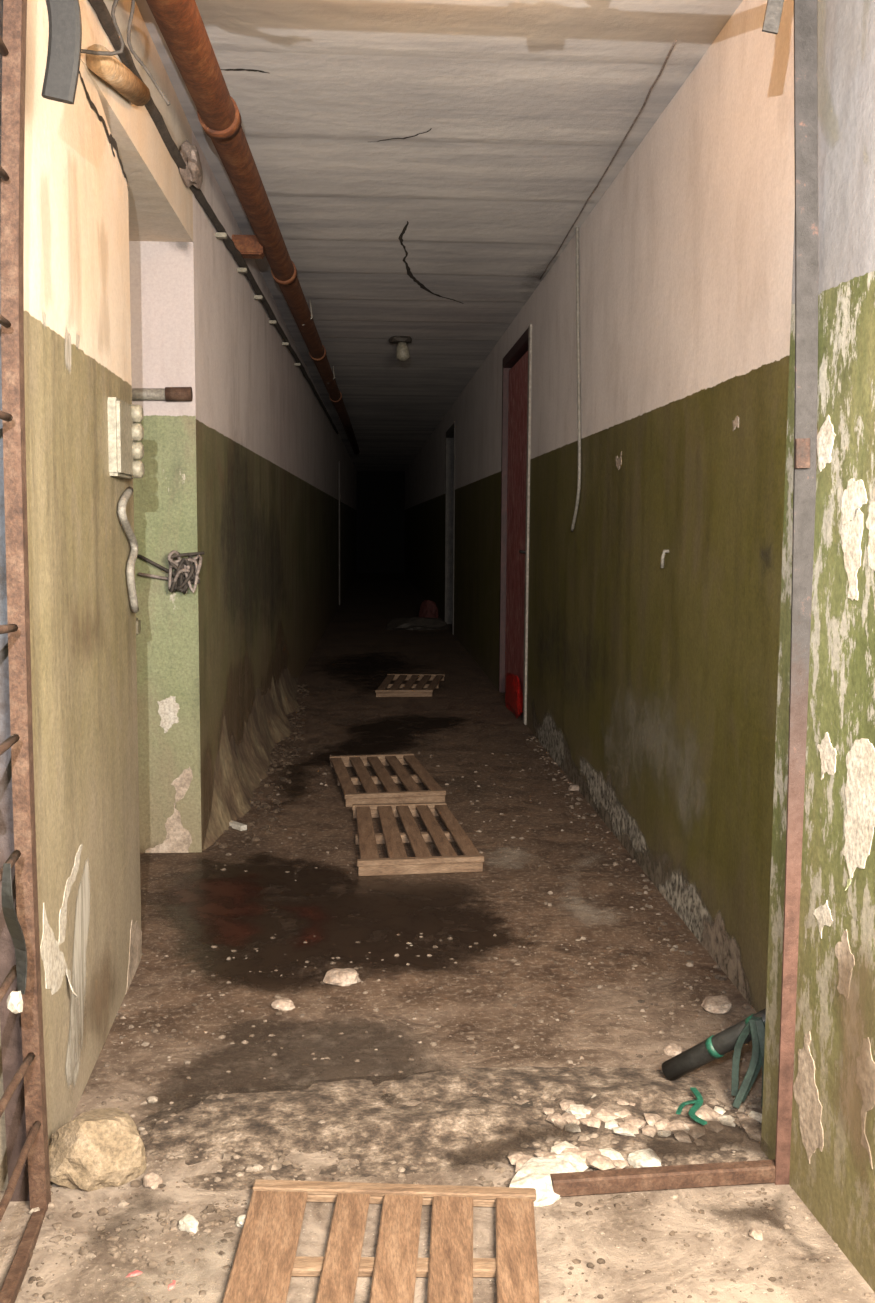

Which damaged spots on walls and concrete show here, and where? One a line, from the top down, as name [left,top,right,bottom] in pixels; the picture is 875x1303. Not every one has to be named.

crack [398,221,464,304]
peeling [817,415,836,472]
peeling [840,478,875,600]
flaking render [157,696,180,733]
flaking render [145,766,193,853]
flaking render [532,700,647,853]
peeling [40,844,83,998]
leakage [164,854,522,992]